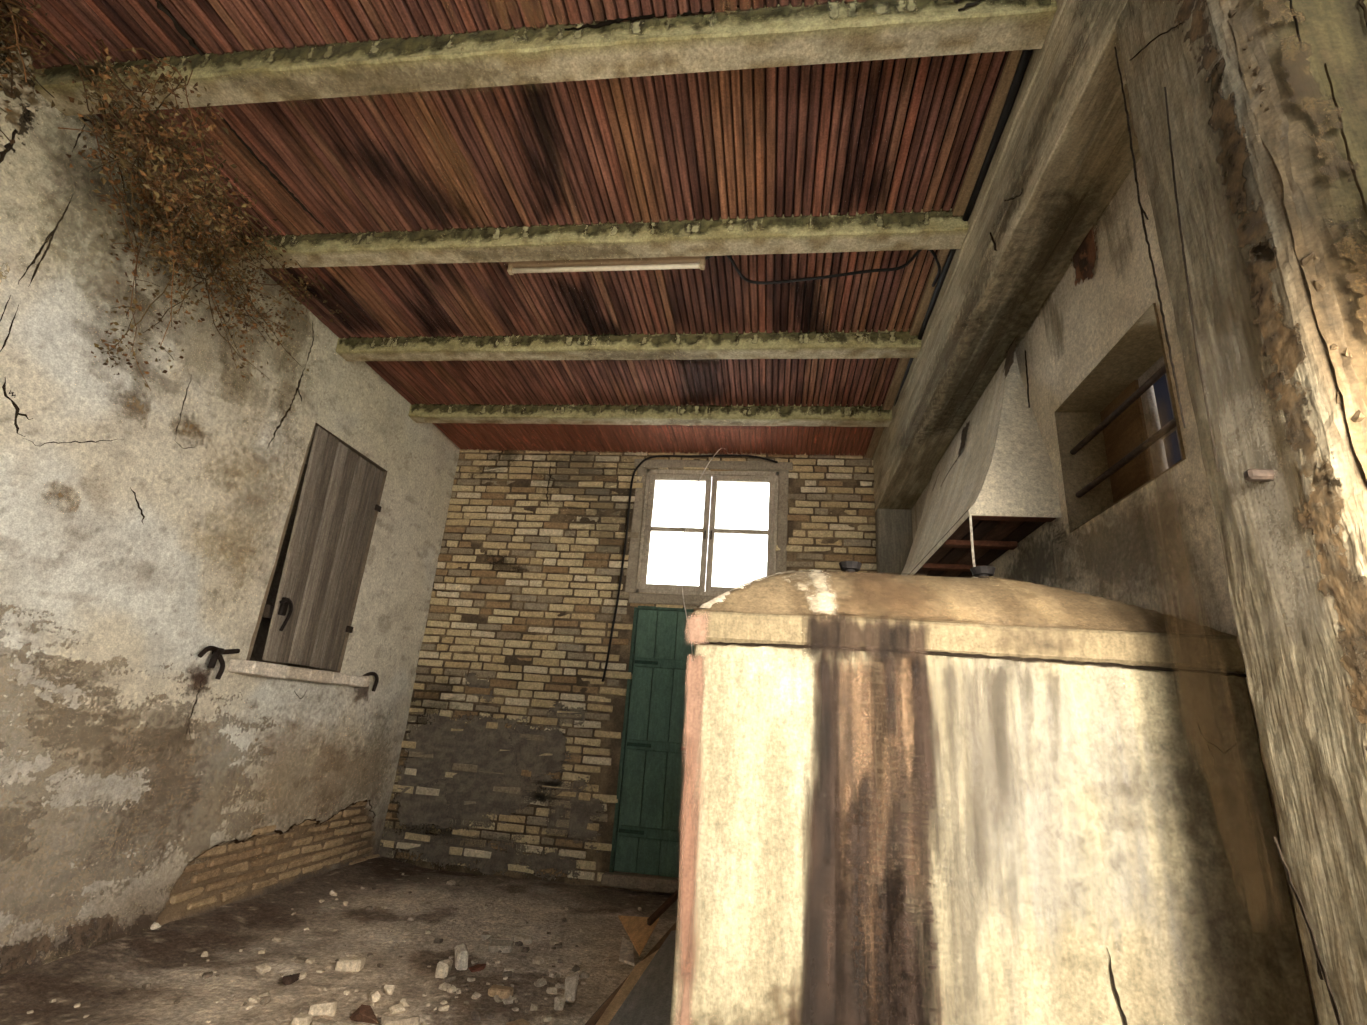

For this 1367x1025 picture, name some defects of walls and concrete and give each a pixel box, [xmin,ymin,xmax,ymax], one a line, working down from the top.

crack [0,129,18,163]
crack [0,195,125,446]
spalling [1172,0,1367,724]
flaking render [170,799,380,910]
water stain [779,569,1012,1025]
crack [1107,949,1128,1025]